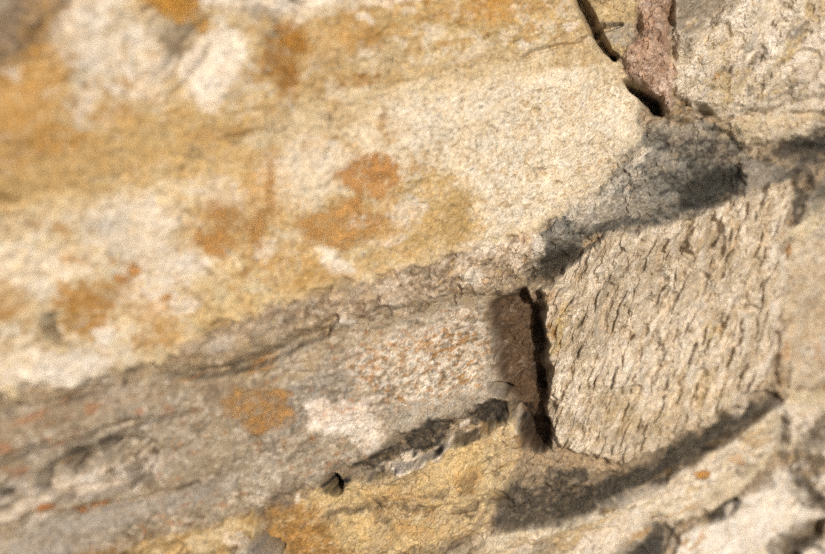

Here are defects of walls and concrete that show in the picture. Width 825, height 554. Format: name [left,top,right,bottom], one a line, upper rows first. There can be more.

crack [520,0,624,62]